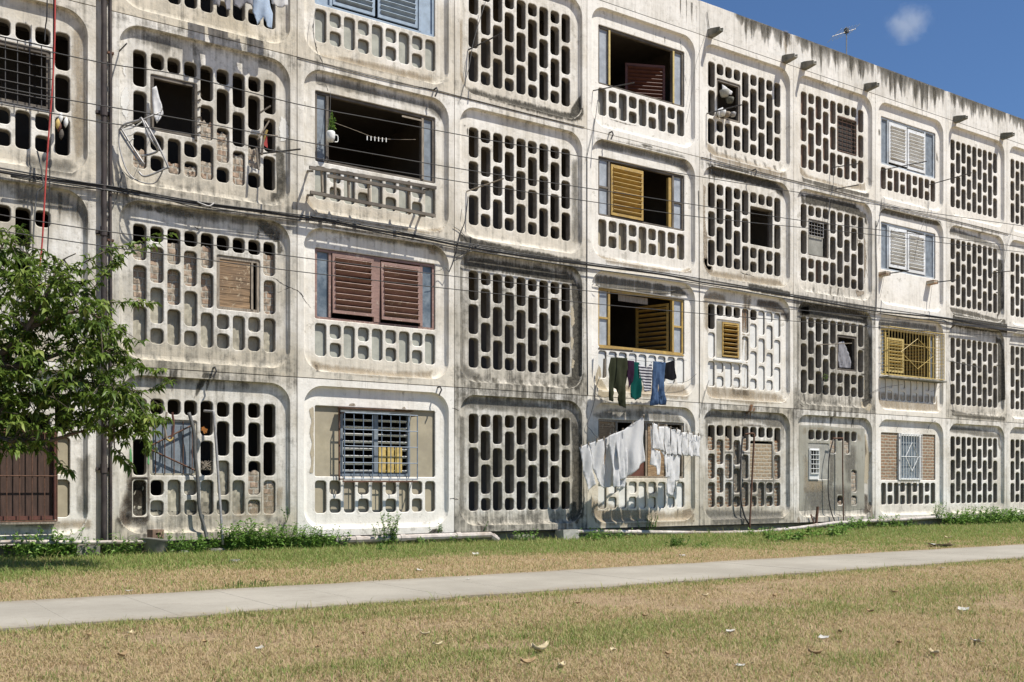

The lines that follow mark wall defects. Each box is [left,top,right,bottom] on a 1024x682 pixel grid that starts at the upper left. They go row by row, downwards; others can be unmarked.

leakage [736,14,1024,127]
leakage [460,398,693,526]